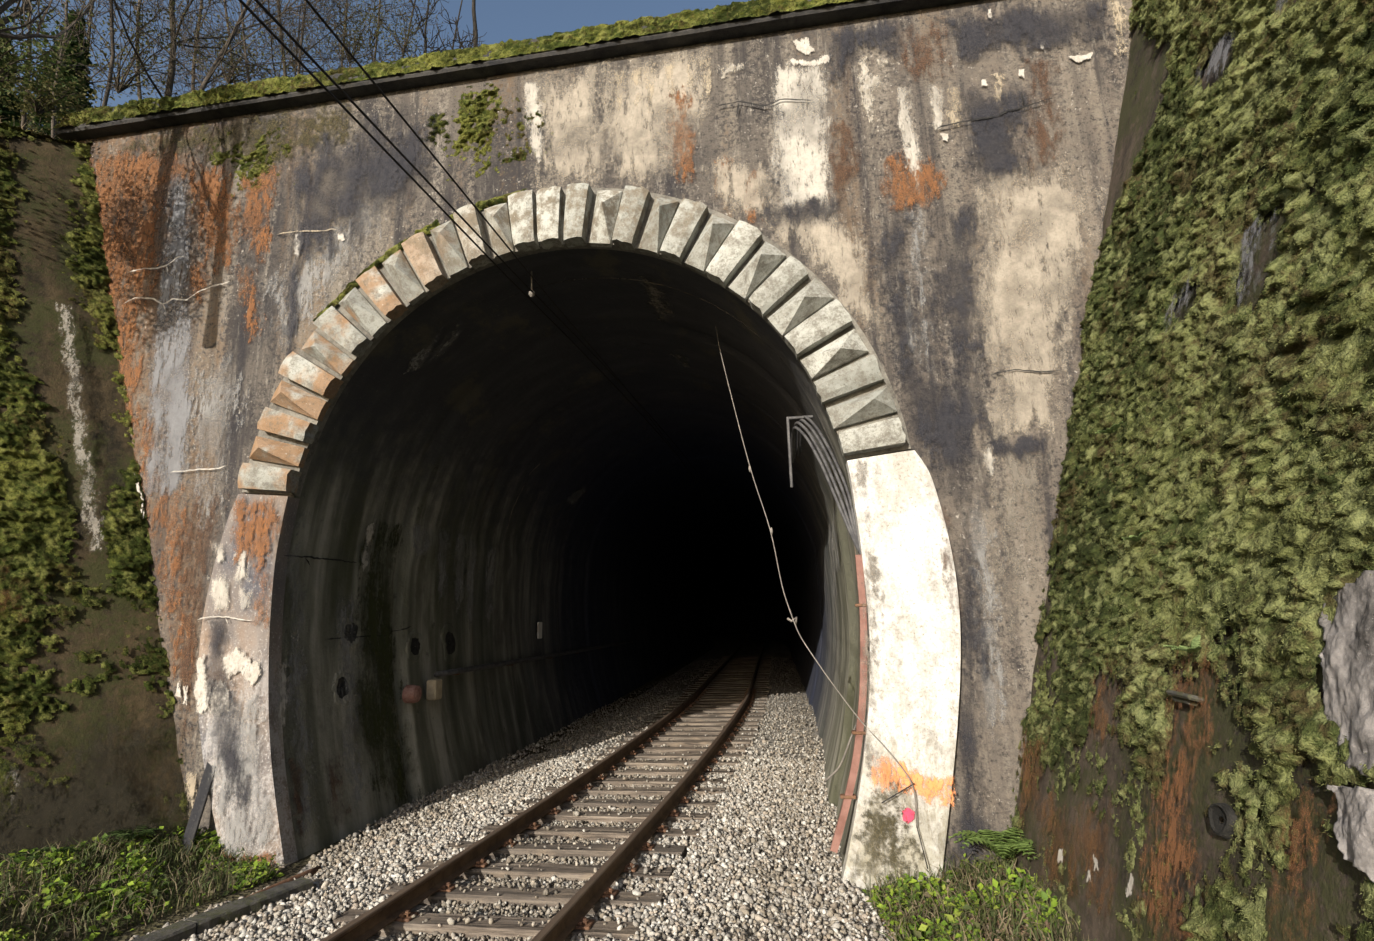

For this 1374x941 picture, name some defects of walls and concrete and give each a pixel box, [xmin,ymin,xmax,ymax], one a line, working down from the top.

rust [669,86,692,109]
rust [884,153,947,211]
crack [125,256,230,309]
rust [89,150,281,733]
water stain [702,0,1127,860]
water stain [362,523,374,571]
rust [1018,731,1115,917]
rust [1137,652,1214,939]
rust [1269,792,1333,936]
spalling [1318,570,1374,883]